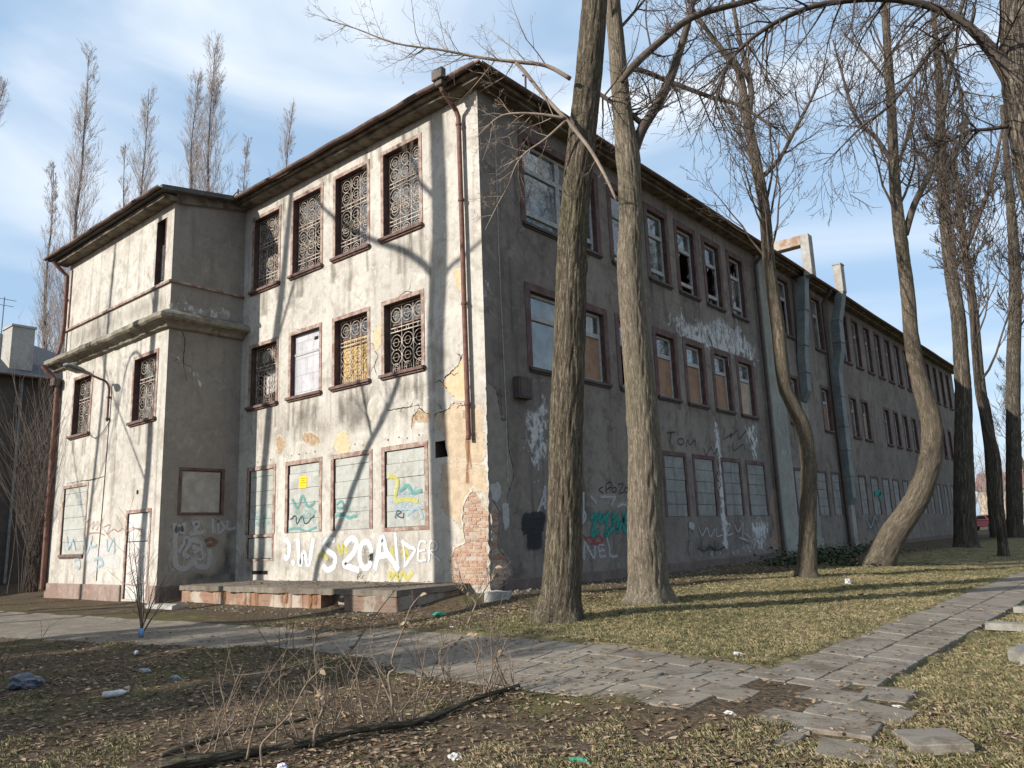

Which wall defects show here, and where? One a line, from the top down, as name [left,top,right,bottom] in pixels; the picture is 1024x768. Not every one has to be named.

crack [388,354,465,429]
flaking render [301,431,321,447]
flaking render [334,430,351,459]
flaking render [410,358,515,591]
water stain [712,422,768,555]